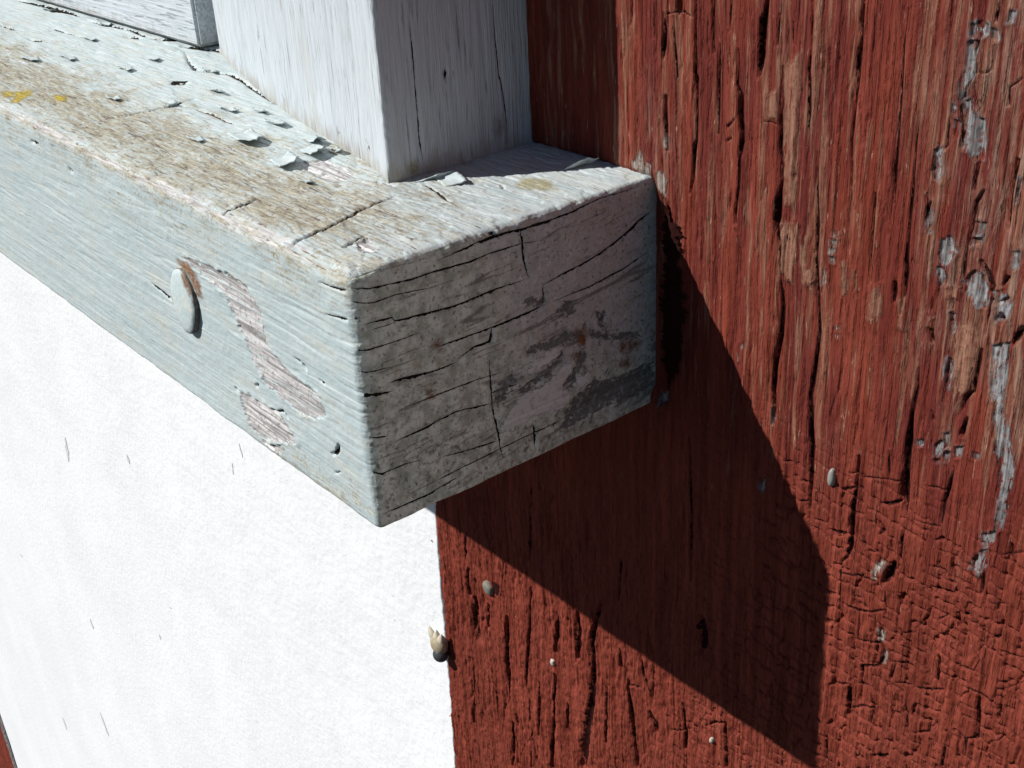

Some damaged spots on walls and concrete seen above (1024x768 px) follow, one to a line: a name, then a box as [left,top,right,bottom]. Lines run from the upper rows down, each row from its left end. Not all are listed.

peeling [952,10,1017,157]
peeling [227,128,264,141]
peeling [270,135,355,183]
peeling [933,147,943,180]
rust [177,259,201,297]
peeling [936,237,958,283]
peeling [962,271,1012,322]
peeling [181,256,326,454]
crack [312,187,647,514]
crack [786,160,1024,765]
peeling [918,433,979,464]
peeling [968,343,1015,578]